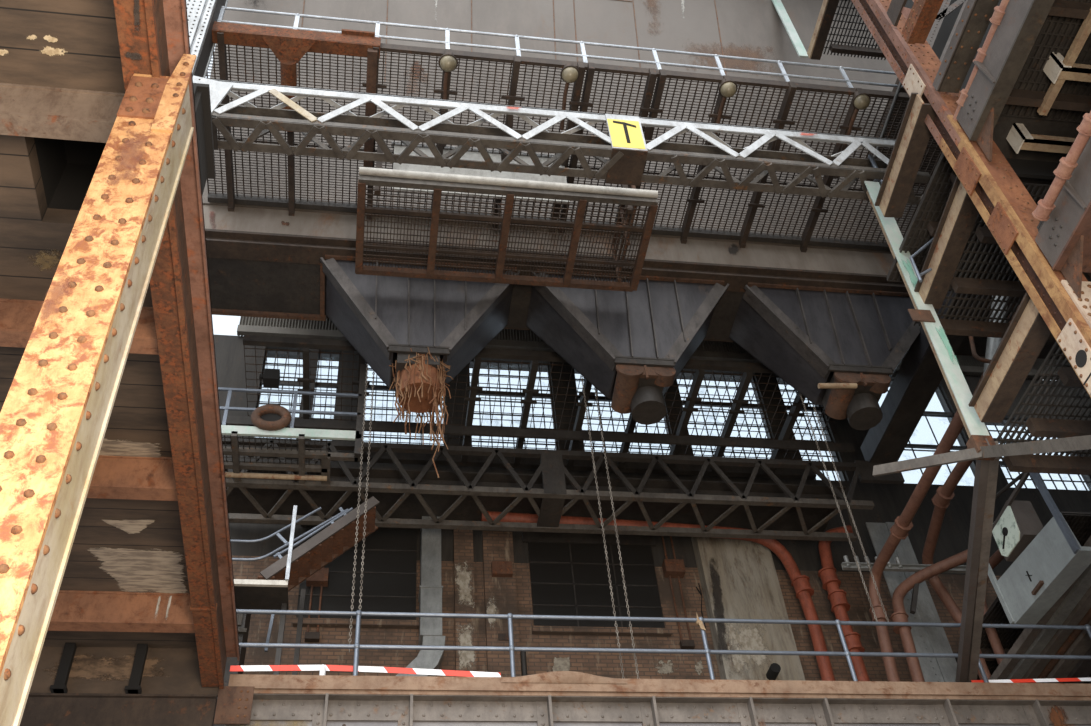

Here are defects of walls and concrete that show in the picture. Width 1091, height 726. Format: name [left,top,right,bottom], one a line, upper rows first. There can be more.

peeling [27,35,65,56]
corrosion [112,134,148,184]
spalling [103,519,155,534]
spalling [87,547,188,593]
damp [710,559,727,655]